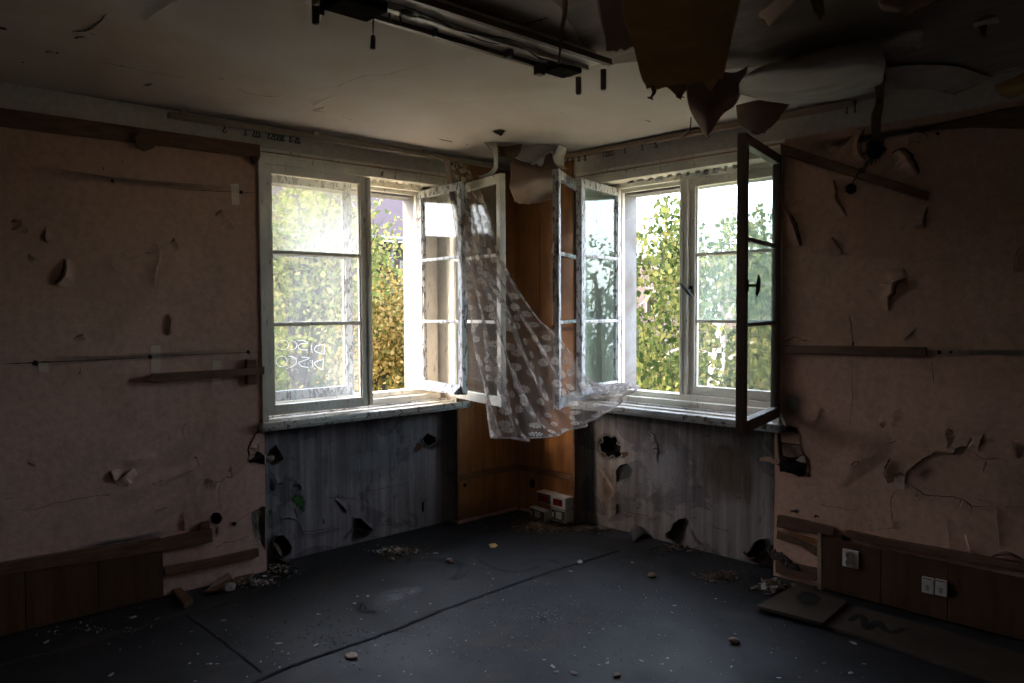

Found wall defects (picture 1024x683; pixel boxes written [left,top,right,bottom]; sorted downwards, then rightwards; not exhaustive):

peeling [836,126,919,194]
peeling [54,259,77,289]
peeling [878,267,919,311]
spalling [599,434,633,484]
crack [878,428,1003,530]
spalling [251,505,293,563]
spalling [665,517,687,541]